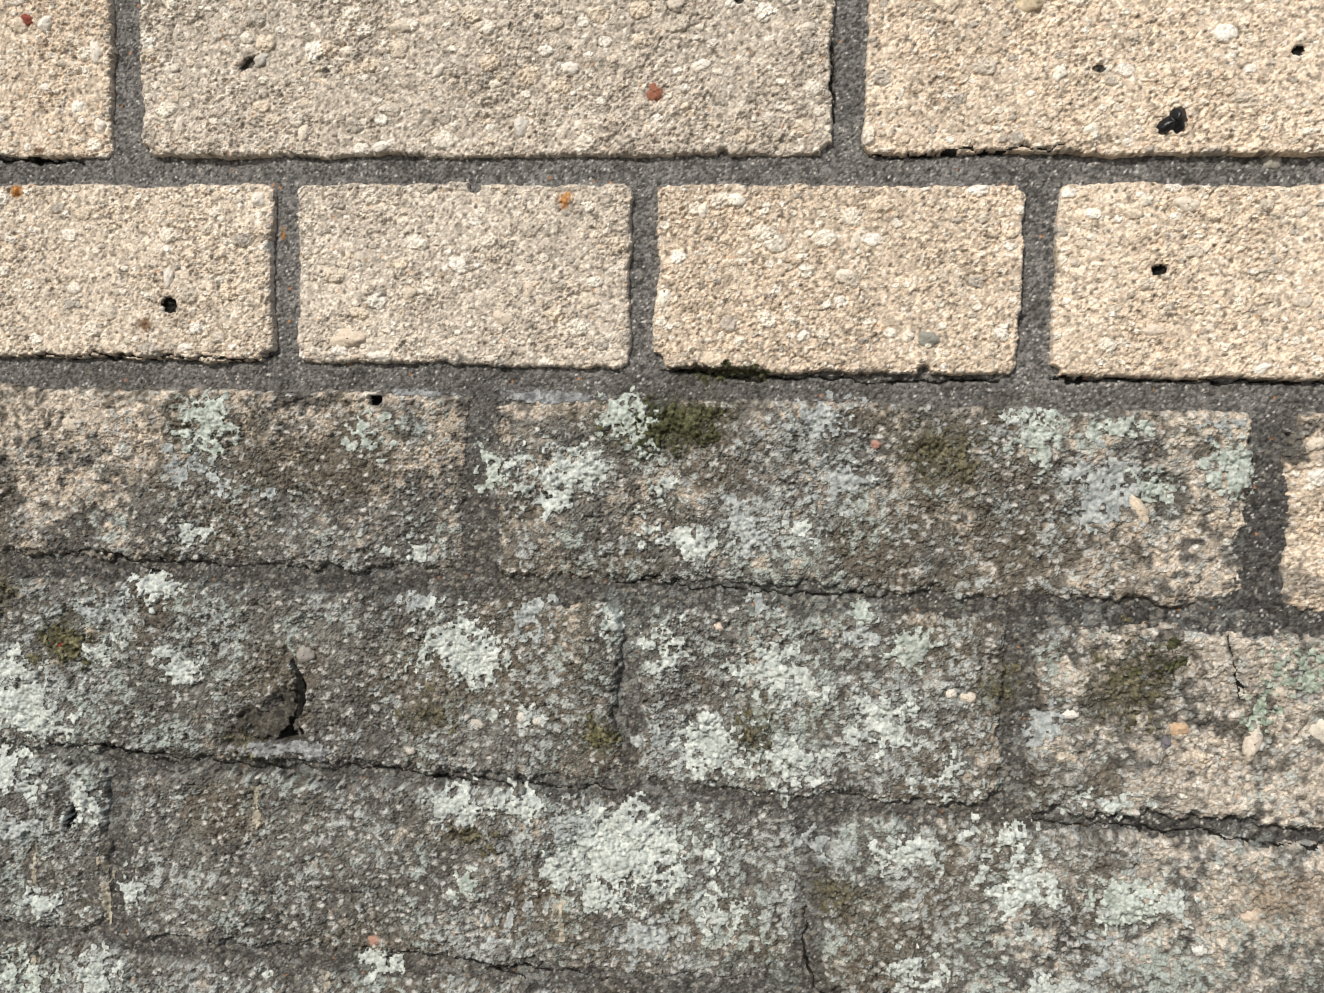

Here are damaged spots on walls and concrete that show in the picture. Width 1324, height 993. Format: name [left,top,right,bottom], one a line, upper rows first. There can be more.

spalling [219,661,333,762]
leakage [250,784,262,830]
leakage [96,854,116,923]
leakage [549,888,567,944]